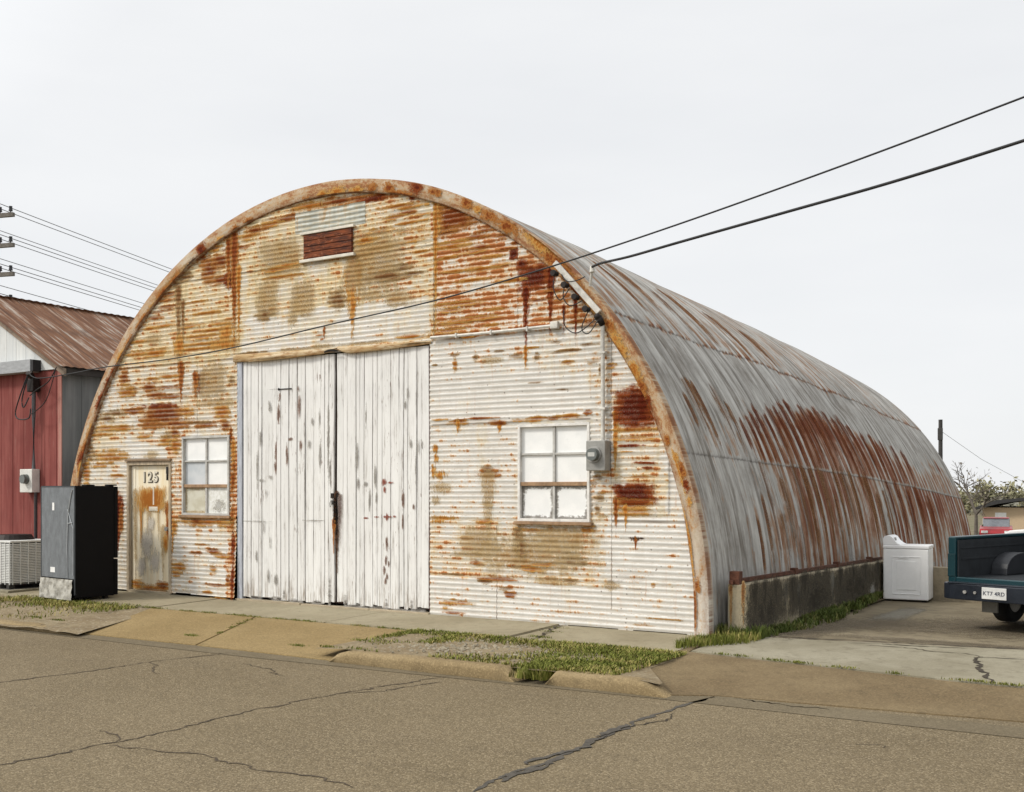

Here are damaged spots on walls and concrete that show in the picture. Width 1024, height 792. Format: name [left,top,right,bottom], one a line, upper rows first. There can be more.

peeling [256,386,331,495]
peeling [356,445,414,529]
rust [77,180,701,635]
rust [681,377,941,570]
leakage [454,526,597,576]
crack [779,636,1020,682]